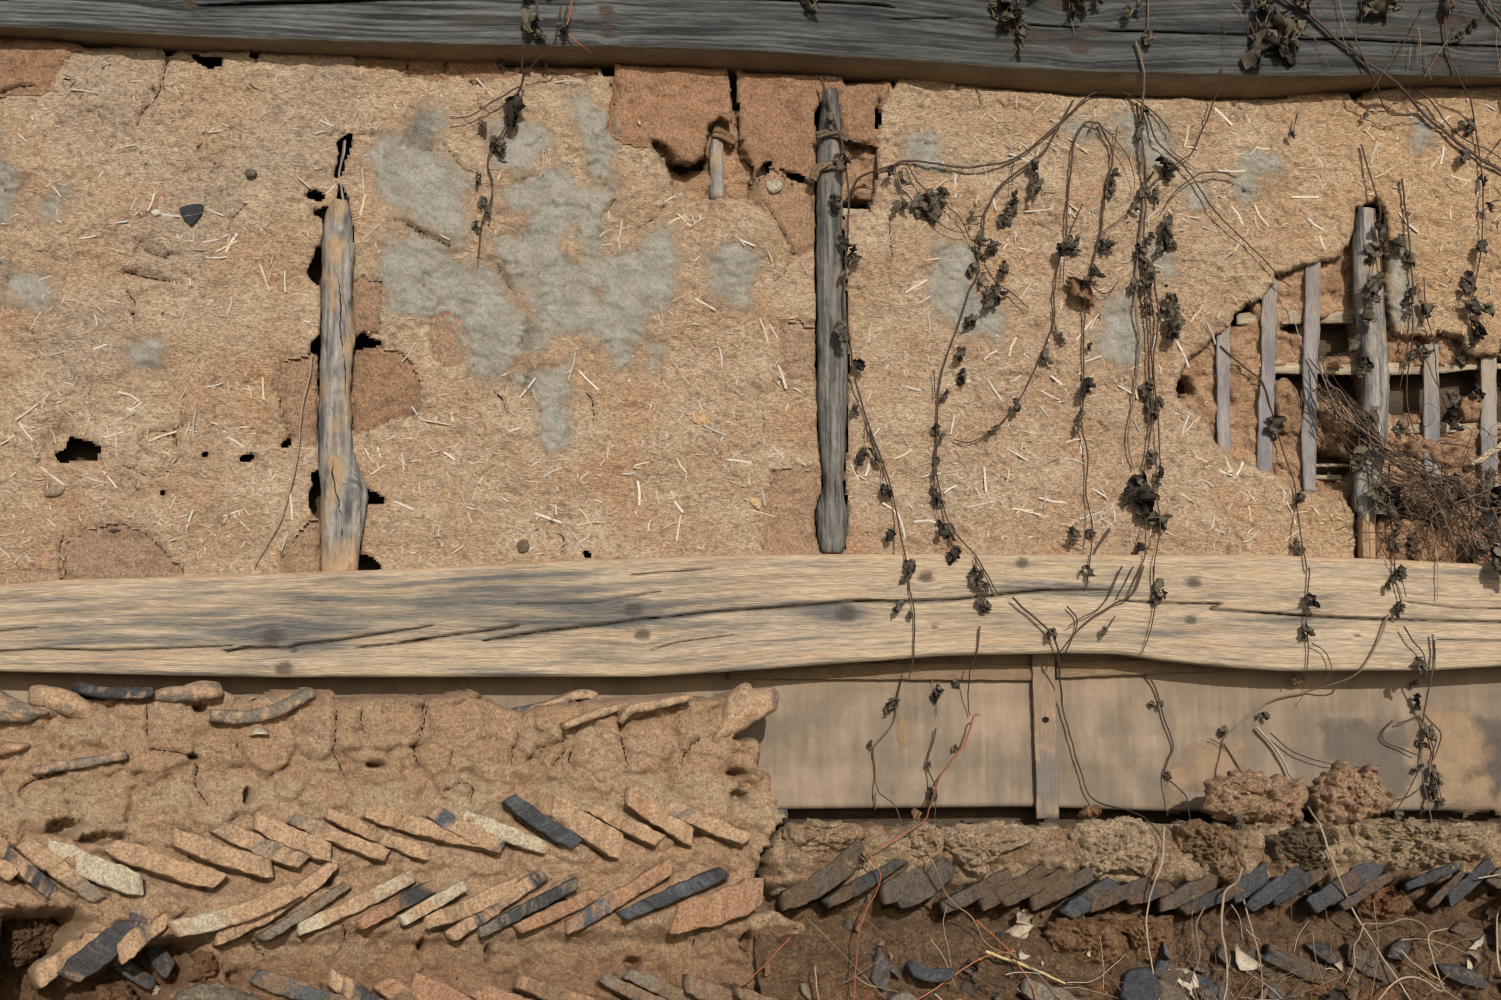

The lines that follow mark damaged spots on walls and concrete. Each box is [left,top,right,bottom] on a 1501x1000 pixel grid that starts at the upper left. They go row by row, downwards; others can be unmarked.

peeling [350,57,891,453]
spalling [1177,213,1362,558]
spalling [1375,213,1501,392]
spalling [1376,401,1501,535]
damp [1473,721,1501,797]